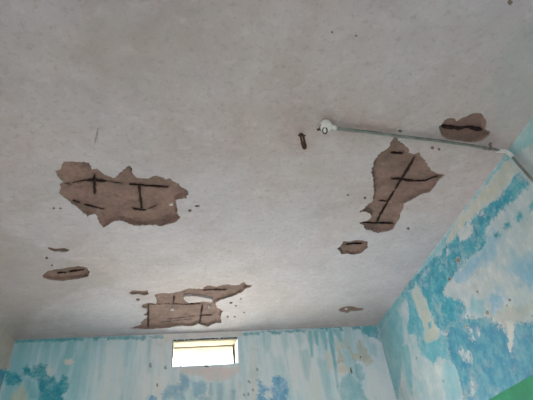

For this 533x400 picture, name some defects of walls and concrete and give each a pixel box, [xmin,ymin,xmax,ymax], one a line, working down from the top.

corrosion [273,93,406,156]
spalling [439,113,490,143]
spalling [55,161,189,227]
spalling [359,129,444,233]
spalling [337,240,368,255]
spalling [42,265,90,281]
spalling [130,282,252,330]